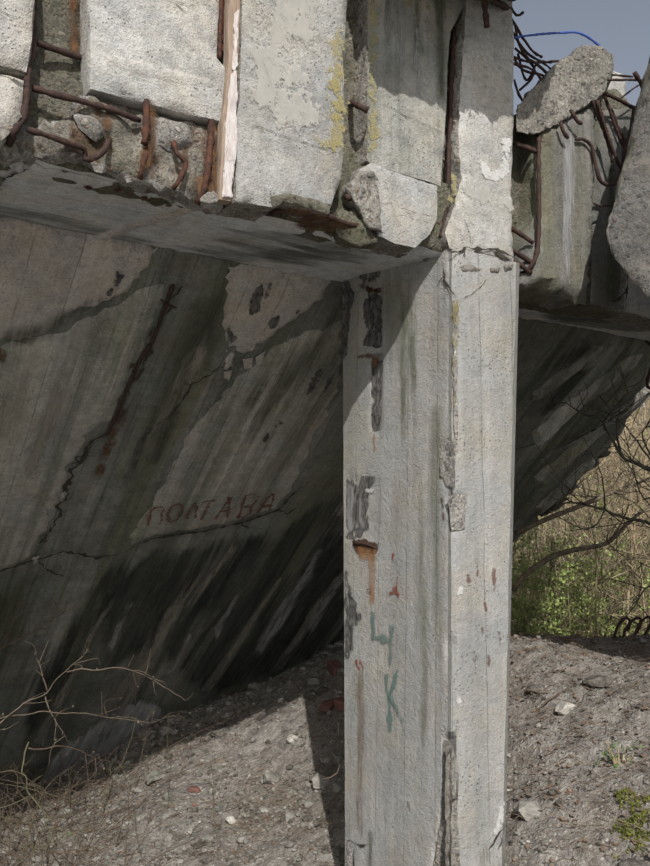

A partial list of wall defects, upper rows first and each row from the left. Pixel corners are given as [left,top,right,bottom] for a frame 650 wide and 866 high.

corrosion [195,126,217,195]
flaking render [0,216,158,340]
peeling [348,283,382,348]
crack [0,286,304,577]
peeling [371,412,381,432]
corrosion [353,538,379,568]
damp [23,499,344,779]
spalling [433,740,461,866]